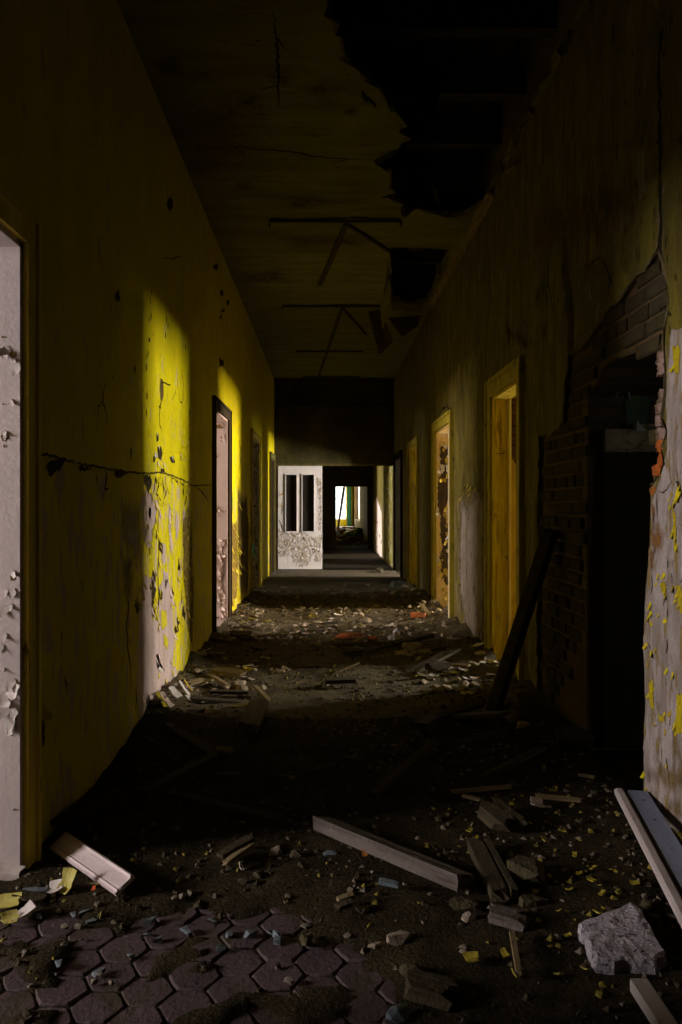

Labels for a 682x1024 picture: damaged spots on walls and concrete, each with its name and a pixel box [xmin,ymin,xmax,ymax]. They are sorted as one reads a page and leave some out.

peeling [0,336,21,376]
peeling [0,570,17,619]
crack [42,452,211,710]
peeling [137,489,194,719]
peeling [217,488,256,621]
peeling [277,477,323,566]
peeling [436,423,484,642]
spalling [535,250,682,832]
peeling [0,667,20,736]